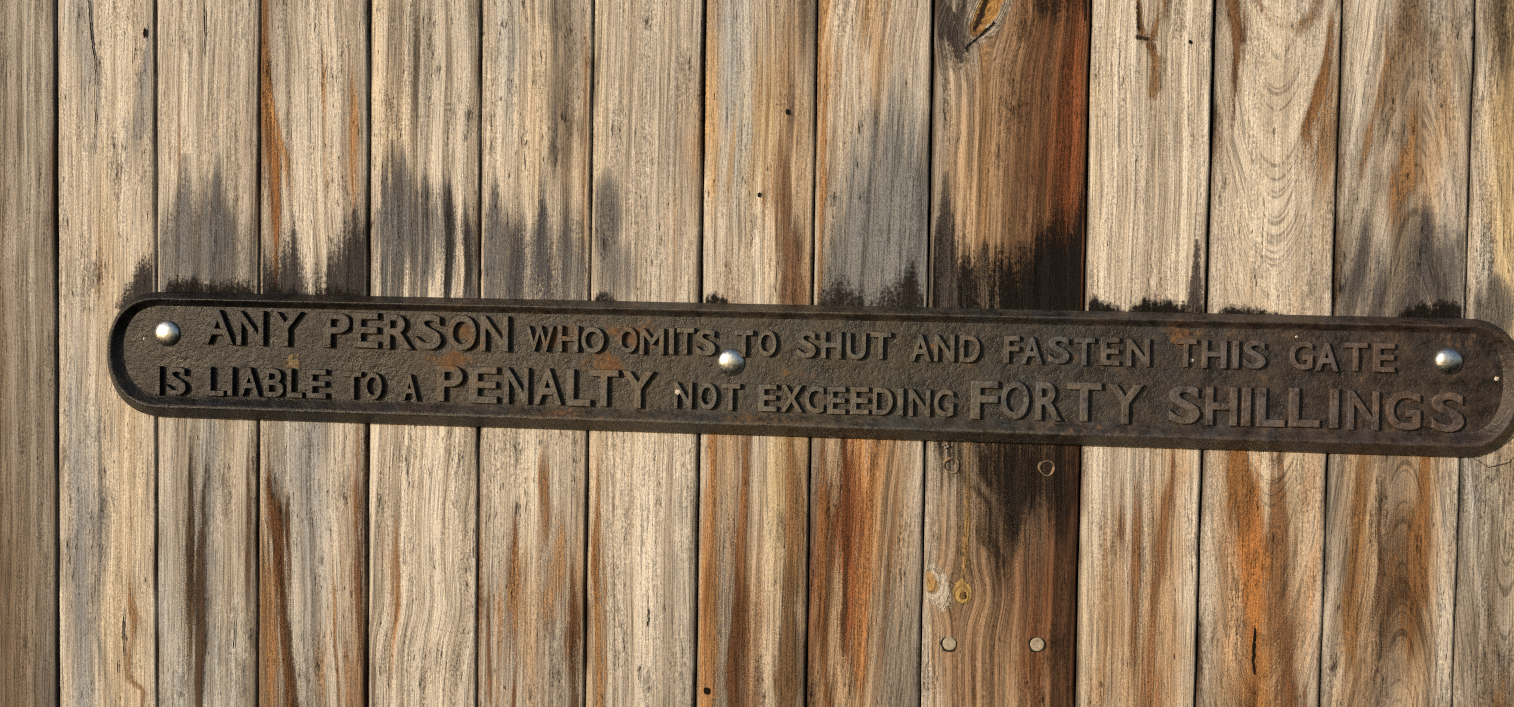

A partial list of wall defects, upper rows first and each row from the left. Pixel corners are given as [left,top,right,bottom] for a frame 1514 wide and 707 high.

water stain [115,143,635,309]
water stain [817,100,1083,310]
water stain [937,441,1076,597]